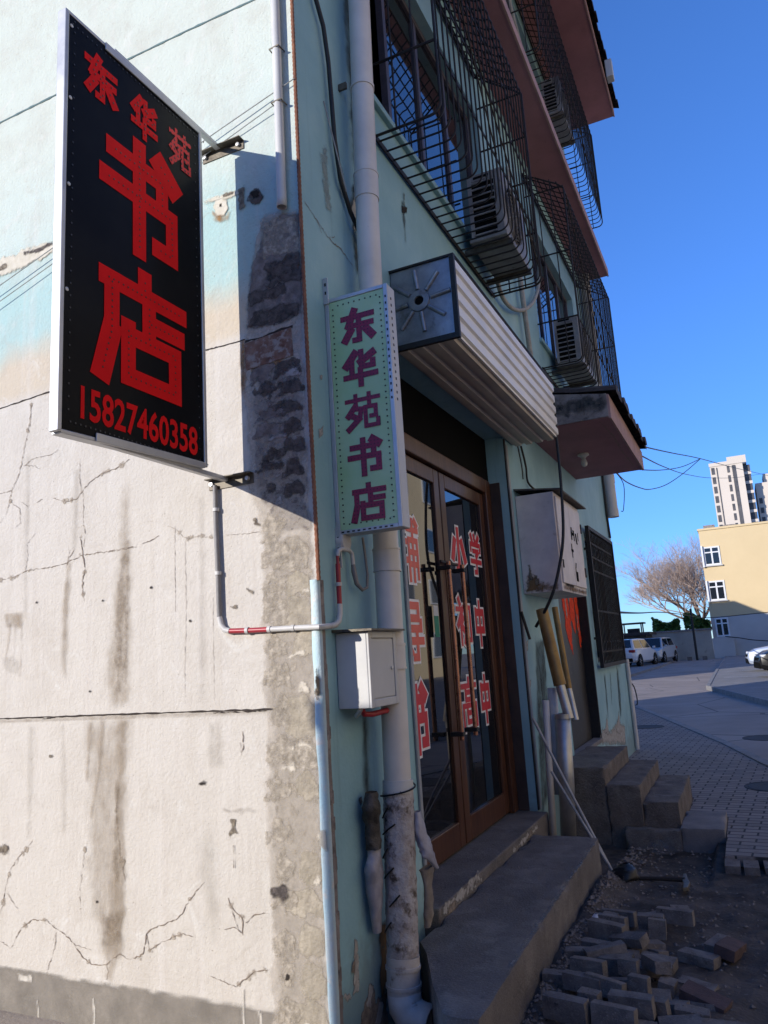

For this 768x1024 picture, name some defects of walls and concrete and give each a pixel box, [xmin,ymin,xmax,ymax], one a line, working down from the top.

flaking render [206,187,264,221]
flaking render [0,242,53,276]
crack [0,391,285,752]
spalling [245,212,329,1024]
crack [0,843,201,980]
crack [224,899,263,935]
crack [211,968,267,987]
peeling [352,940,389,1024]